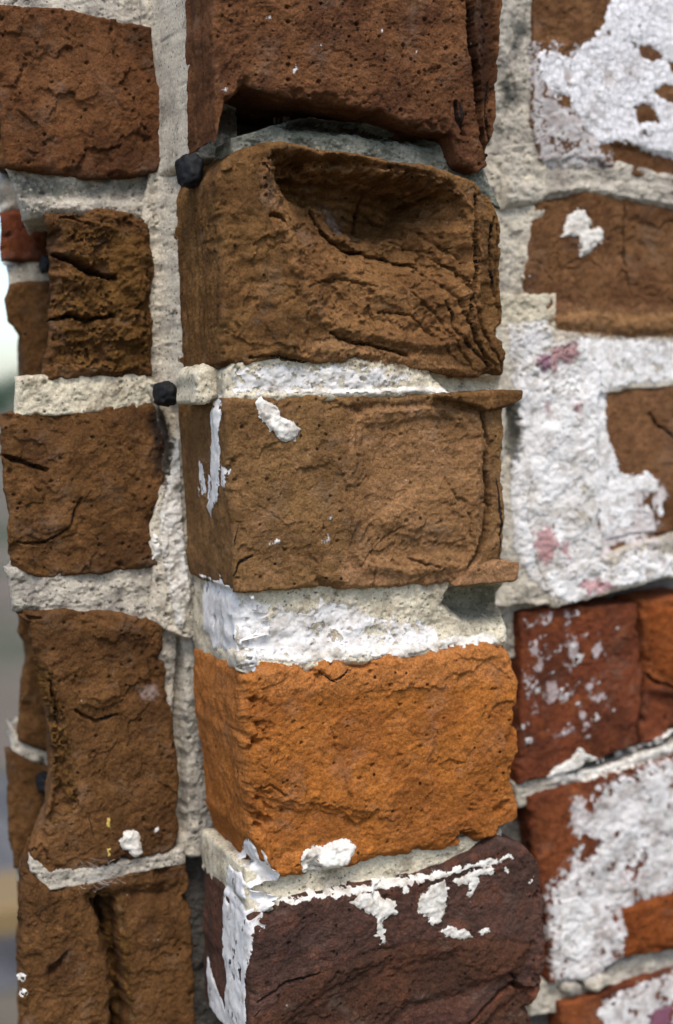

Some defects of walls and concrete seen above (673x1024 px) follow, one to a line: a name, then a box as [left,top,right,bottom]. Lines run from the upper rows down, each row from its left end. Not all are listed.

peeling [525,0,673,171]
spalling [254,146,488,383]
crack [3,456,44,470]
spalling [336,302,673,739]
spalling [206,839,533,1024]
peeling [542,729,673,985]